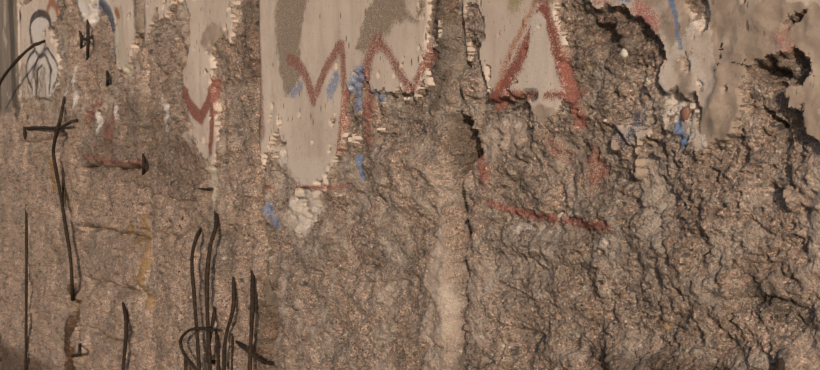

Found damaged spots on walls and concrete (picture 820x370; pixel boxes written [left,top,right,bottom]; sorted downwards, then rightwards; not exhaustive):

spalling [0,0,490,370]
spalling [461,0,820,370]